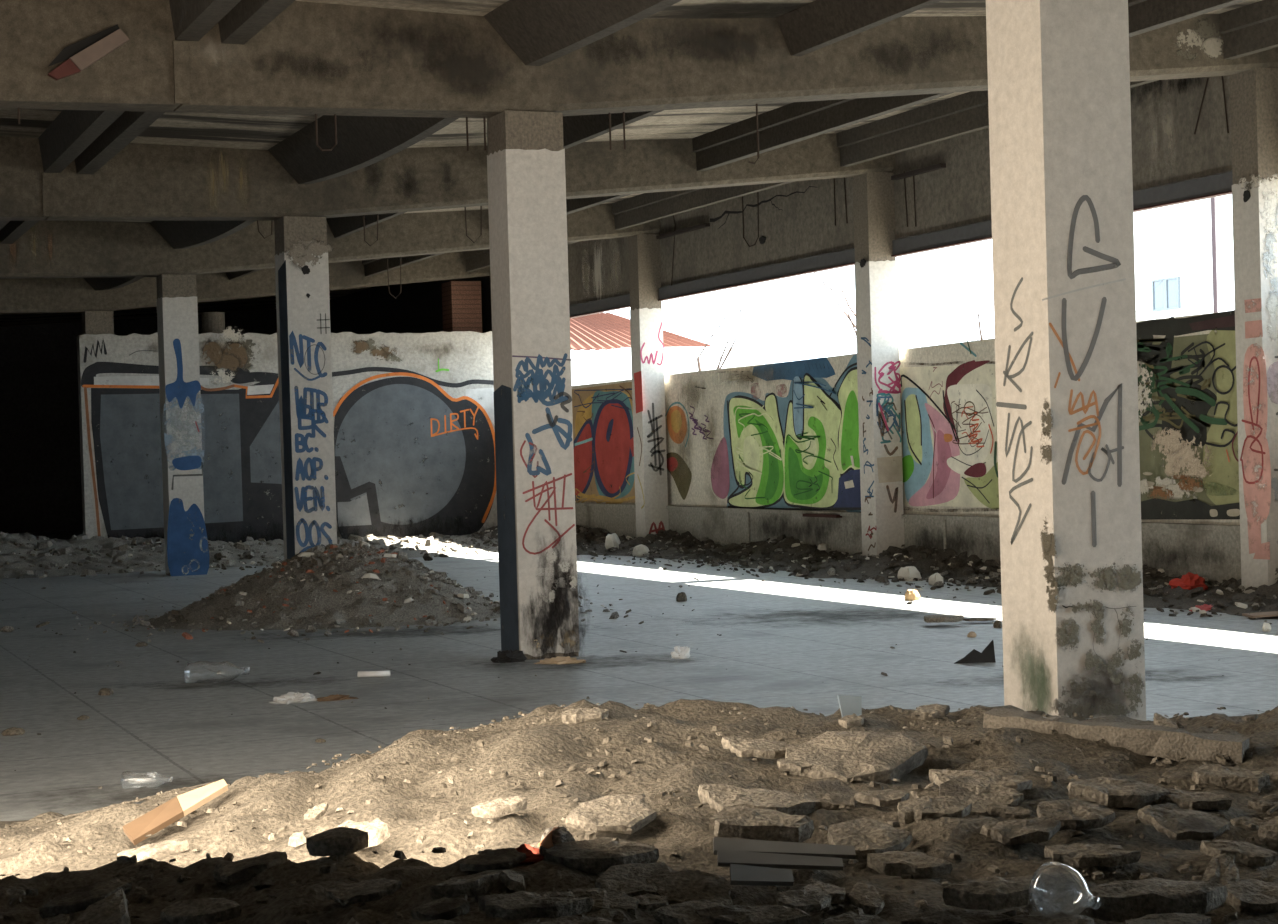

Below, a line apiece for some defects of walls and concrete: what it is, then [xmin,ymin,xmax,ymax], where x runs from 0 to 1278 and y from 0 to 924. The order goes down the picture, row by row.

spalling [1176,19,1224,60]
spalling [1194,76,1229,134]
peeling [286,238,333,275]
water stain [528,543,585,659]
water stain [1021,656,1049,711]